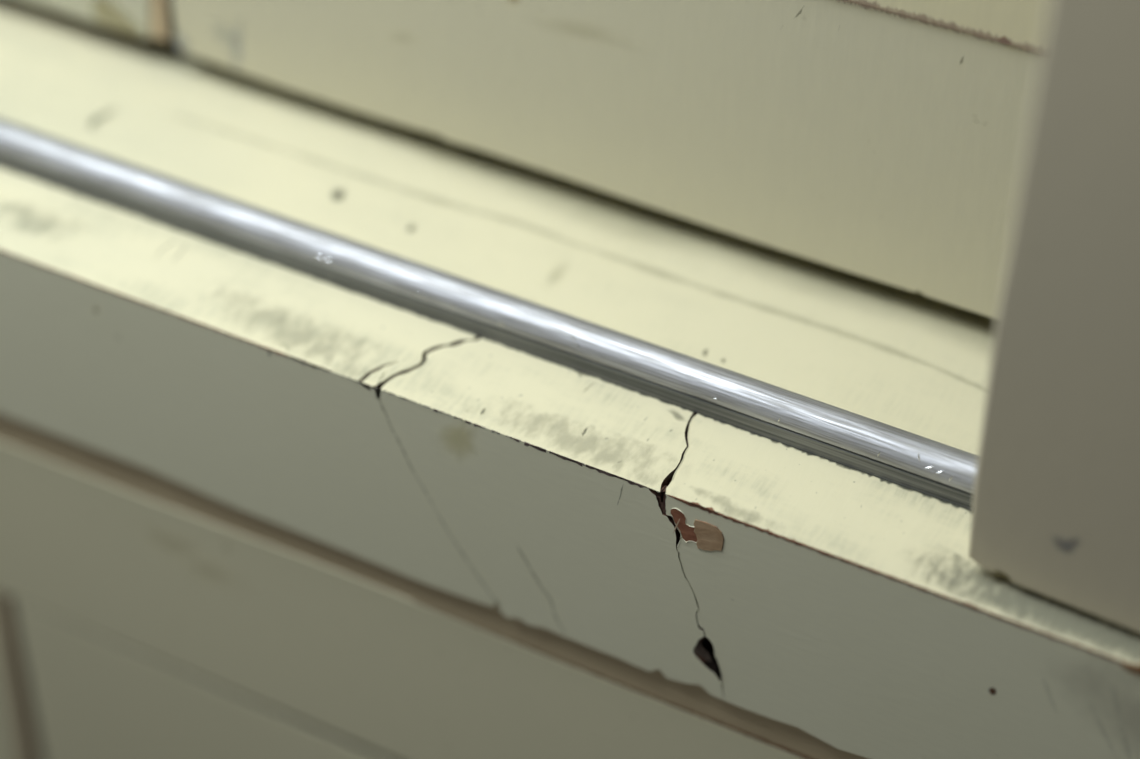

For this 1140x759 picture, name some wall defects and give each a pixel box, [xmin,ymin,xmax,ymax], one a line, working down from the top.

crack [359,336,482,399]
crack [649,412,705,636]
peeling [670,502,724,551]